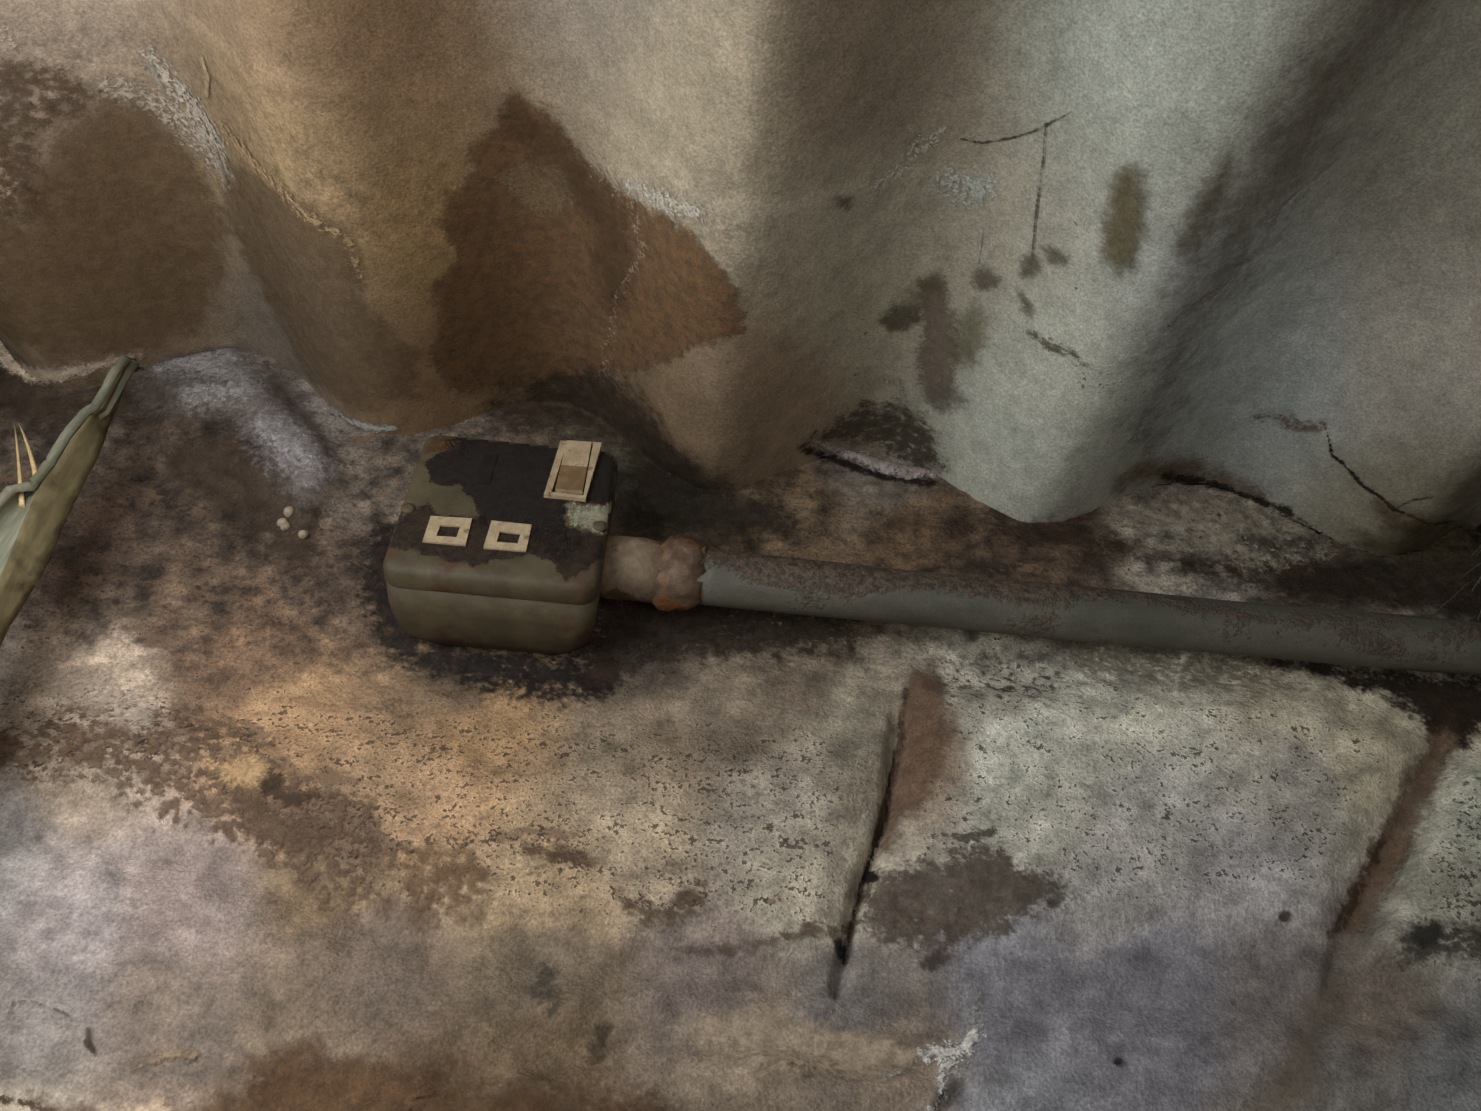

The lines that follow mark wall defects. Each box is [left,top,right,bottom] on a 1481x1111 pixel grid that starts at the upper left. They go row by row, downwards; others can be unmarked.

water stain [0,94,748,433]
peeling [975,269,997,291]
crack [960,113,1068,257]
peeling [1018,248,1092,367]
water stain [1102,167,1146,270]
peeling [799,277,980,487]
crack [1254,415,1456,533]
water stain [351,514,863,710]
water stain [925,652,1069,705]
crack [834,659,954,964]